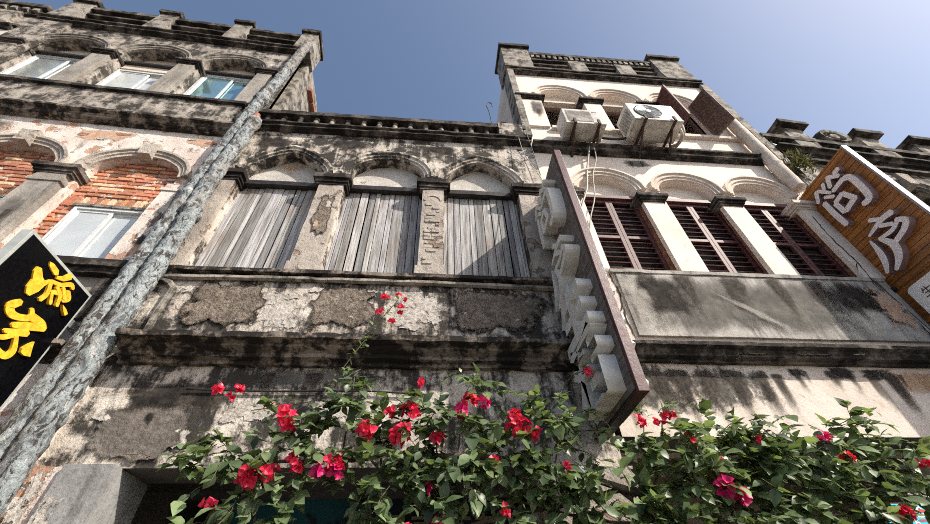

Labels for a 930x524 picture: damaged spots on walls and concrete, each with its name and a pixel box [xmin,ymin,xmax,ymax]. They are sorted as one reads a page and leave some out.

water stain [256,136,293,151]
water stain [331,139,367,151]
water stain [420,146,455,158]
flaking render [177,280,378,331]
flaking render [393,289,545,334]
water stain [636,274,888,332]
peeling [862,287,926,333]
water stain [638,363,808,416]
water stain [824,367,918,409]
peeling [1,447,65,524]